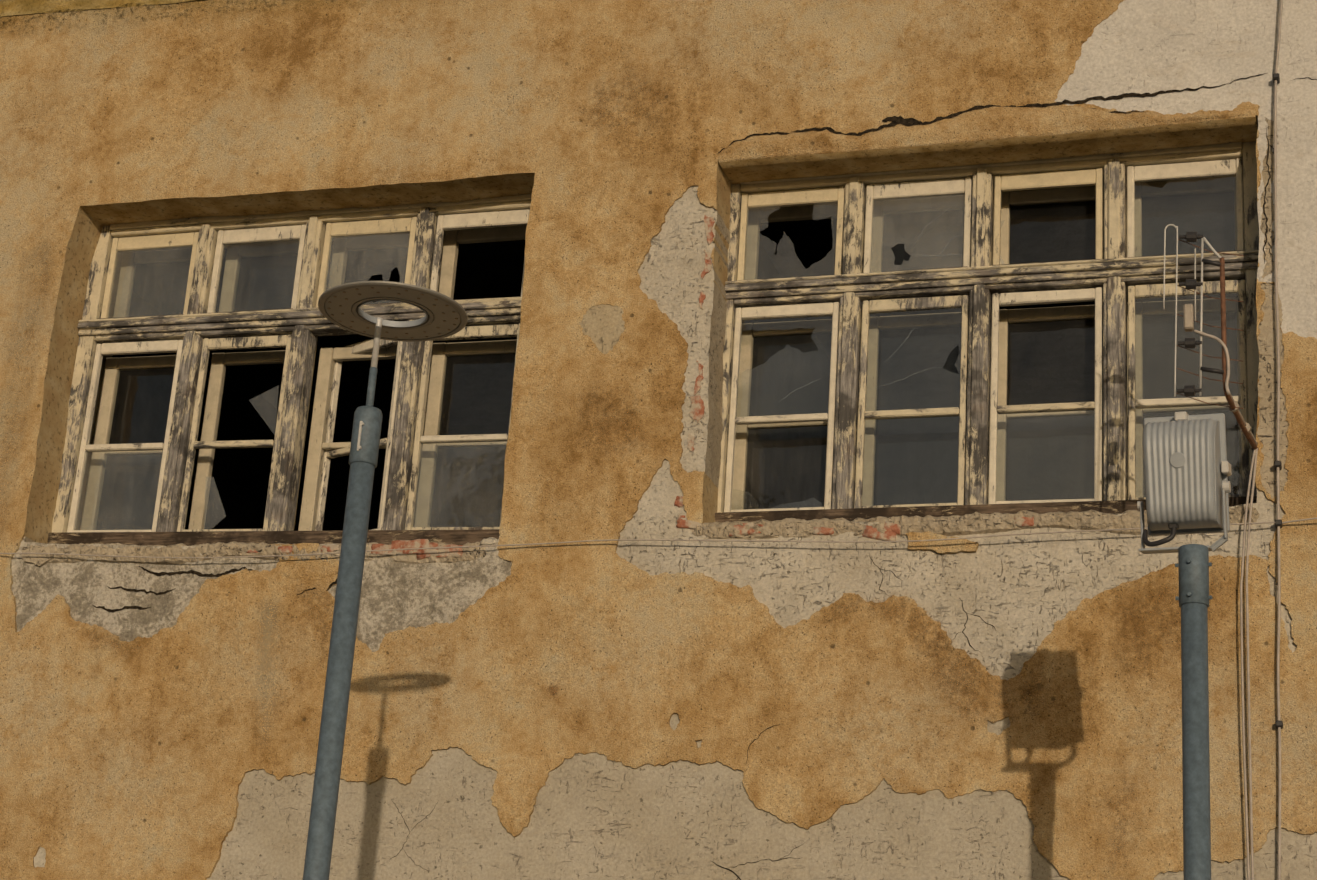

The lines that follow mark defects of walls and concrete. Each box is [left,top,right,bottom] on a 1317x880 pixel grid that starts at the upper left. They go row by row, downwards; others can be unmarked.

crack [718,73,1317,153]
flaking render [1055,0,1317,339]
spalling [579,304,625,354]
flaking render [616,186,1285,680]
flaking render [11,536,341,642]
flaking render [356,536,512,652]
flaking render [207,769,315,880]
flaking render [329,740,1070,880]
flaking render [1154,871,1184,880]
flaking render [1211,828,1317,880]